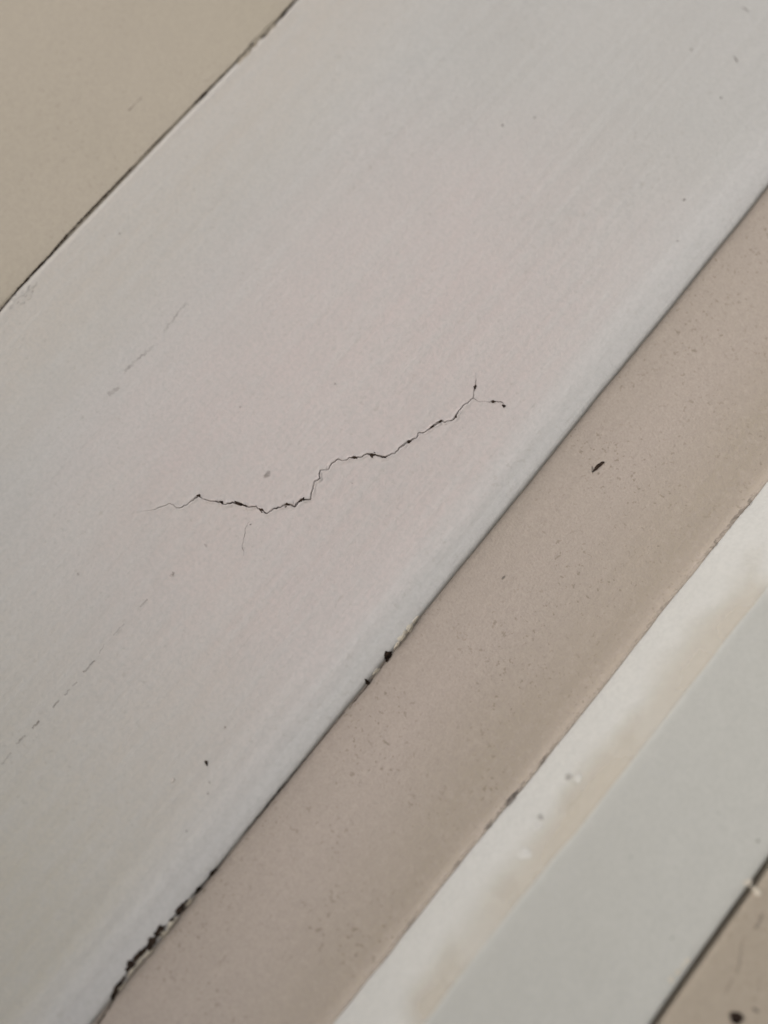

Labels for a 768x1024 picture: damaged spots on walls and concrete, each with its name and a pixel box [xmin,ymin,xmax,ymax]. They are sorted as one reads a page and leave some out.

crack [136,381,506,525]